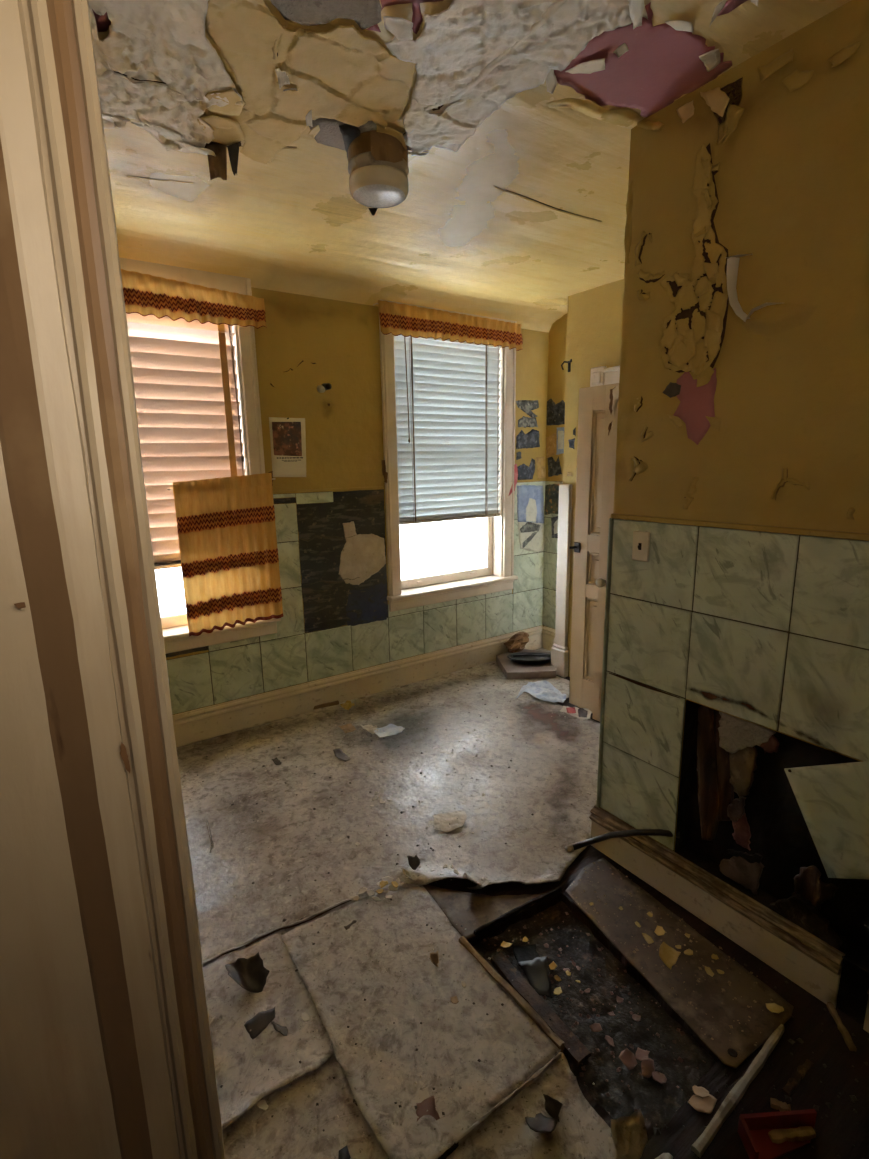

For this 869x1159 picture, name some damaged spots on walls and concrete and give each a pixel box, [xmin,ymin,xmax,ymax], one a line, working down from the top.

peeling [88,0,758,445]
crack [489,181,665,300]
peeling [296,460,388,633]
spalling [686,704,869,951]
crack [202,898,352,964]
peeling [659,942,681,969]
peeling [766,1003,784,1014]